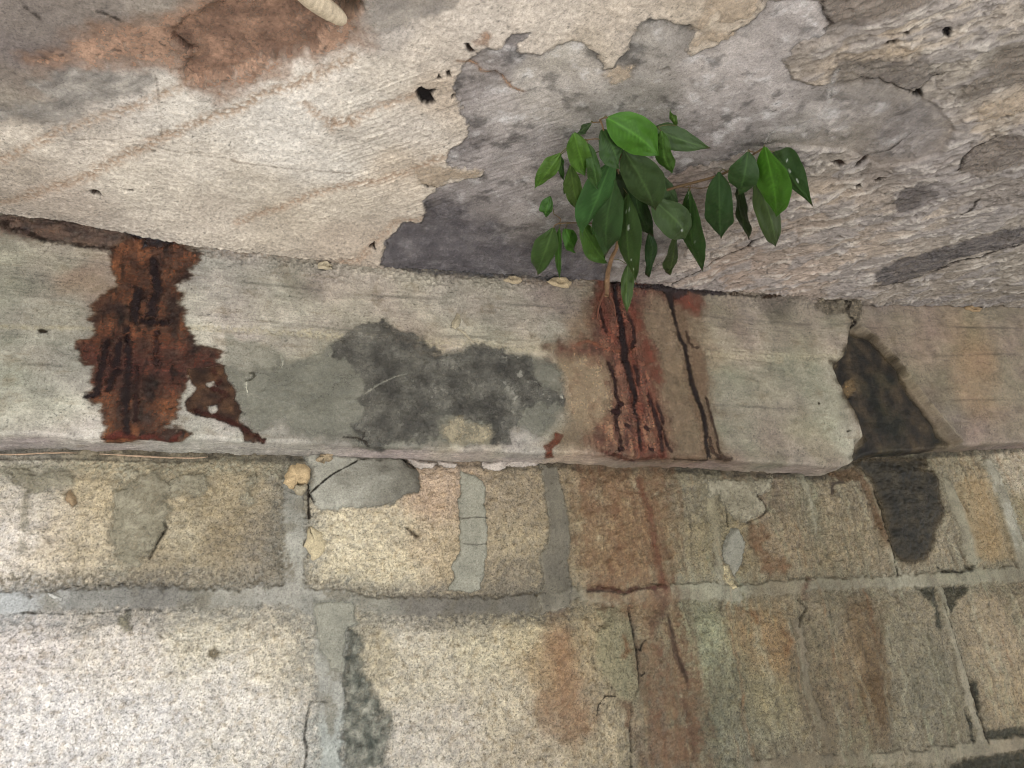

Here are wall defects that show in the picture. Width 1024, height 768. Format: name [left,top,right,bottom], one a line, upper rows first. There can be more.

peeling [369,0,943,288]
peeling [960,135,1024,176]
peeling [964,44,1024,103]
corrosion [74,234,266,444]
leakage [225,281,629,471]
corrosion [544,433,563,458]
corrosion [558,280,703,768]
leakage [632,284,732,463]
leakage [828,331,948,564]
peeling [876,226,1024,285]